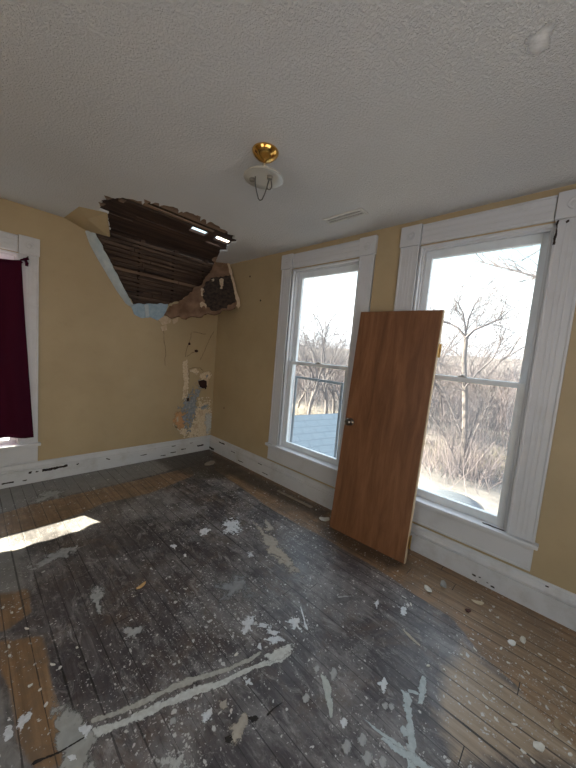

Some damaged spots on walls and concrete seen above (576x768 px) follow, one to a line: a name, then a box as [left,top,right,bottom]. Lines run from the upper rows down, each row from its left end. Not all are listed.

flaking render [85,231,178,331]
spalling [212,263,240,308]
peeling [173,359,243,463]